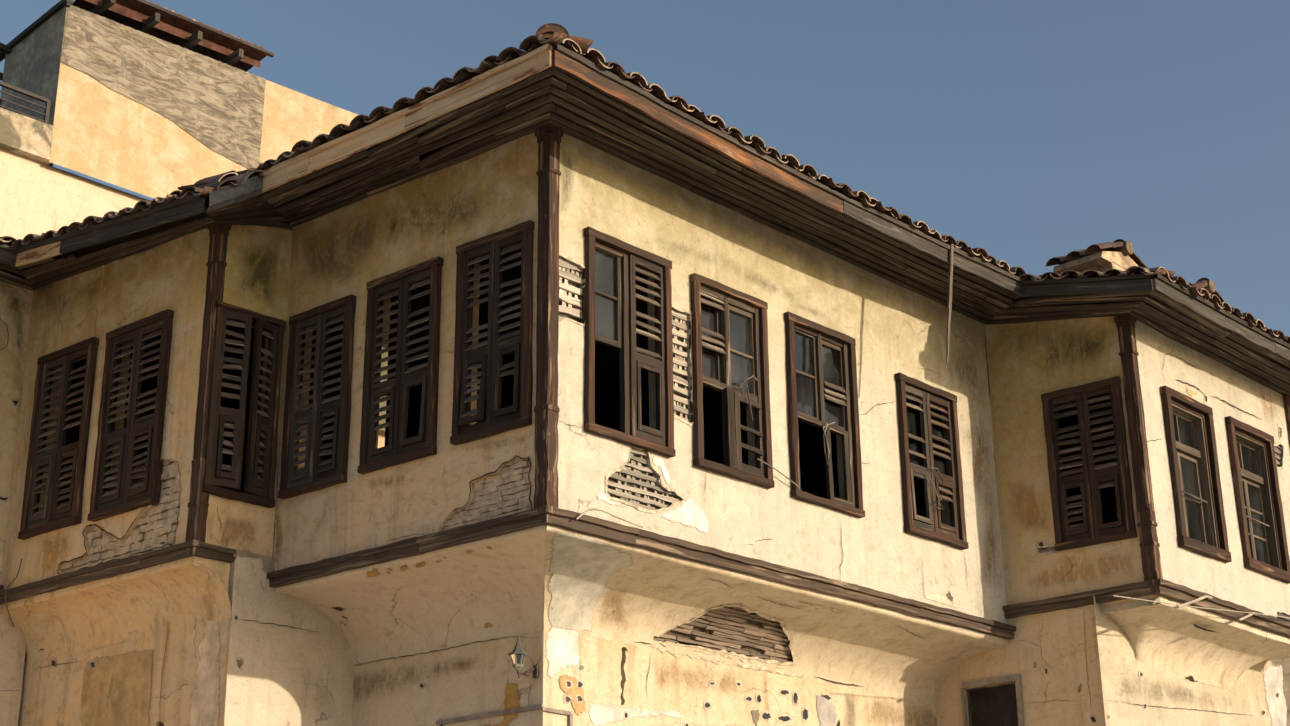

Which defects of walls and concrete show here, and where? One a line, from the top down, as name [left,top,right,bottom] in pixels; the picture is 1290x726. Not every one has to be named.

crack [1161,344,1263,420]
spalling [57,459,182,575]
spalling [441,455,532,531]
spalling [597,446,709,533]
peeling [80,650,164,726]
spalling [652,604,809,697]